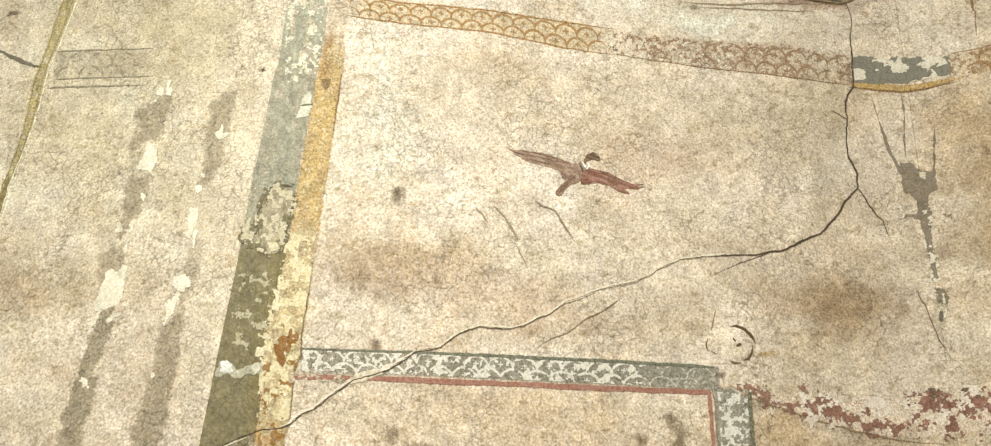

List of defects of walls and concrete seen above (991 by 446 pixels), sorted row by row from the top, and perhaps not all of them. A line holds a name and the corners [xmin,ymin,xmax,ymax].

peeling [854,68,866,80]
peeling [872,56,947,82]
crack [219,4,893,446]
flaking render [215,180,316,422]
peeling [737,383,991,442]